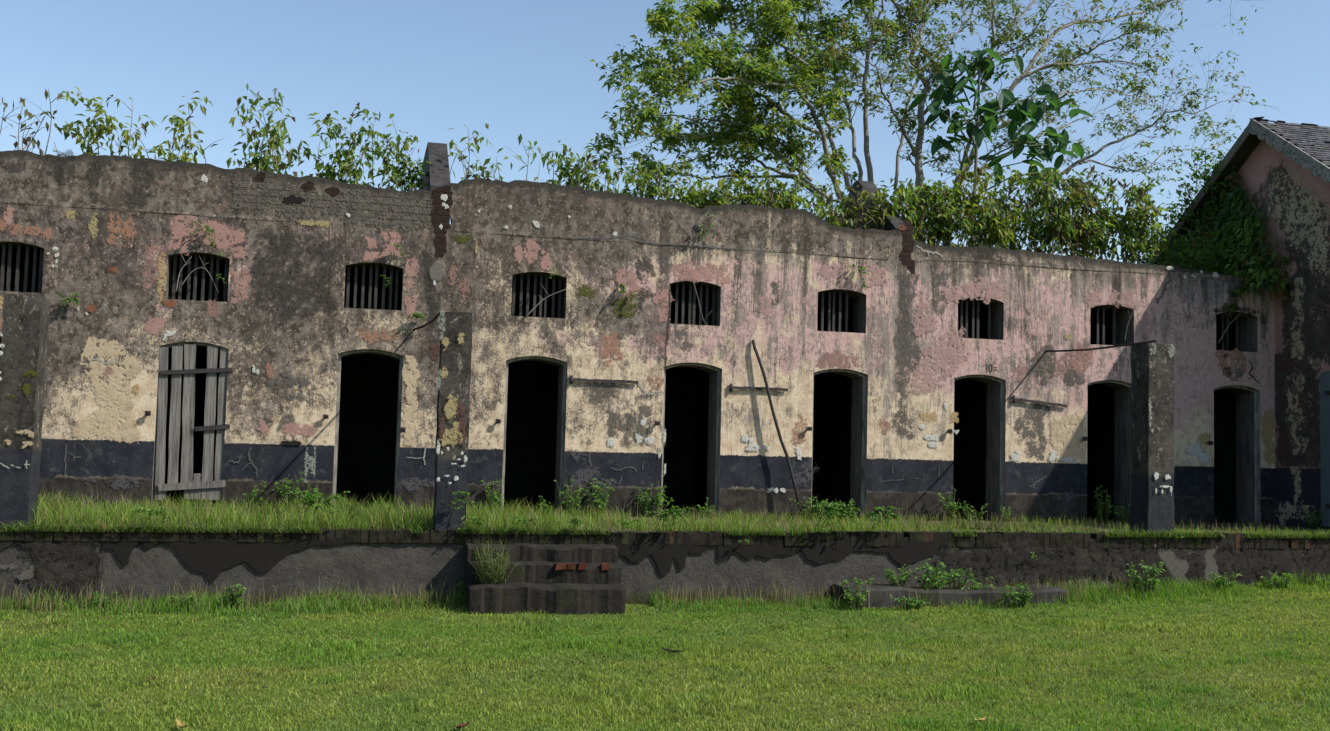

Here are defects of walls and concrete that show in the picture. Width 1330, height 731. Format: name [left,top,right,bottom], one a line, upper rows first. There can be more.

peeling [4,429,38,448]
peeling [69,337,142,444]
peeling [256,419,319,446]
spalling [106,172,470,345]
peeling [401,355,420,446]
leakage [771,281,781,305]
leakage [892,270,959,448]
peeling [1049,415,1087,463]
leakage [1247,161,1330,476]
peeling [1261,159,1330,525]
leakage [102,534,352,582]